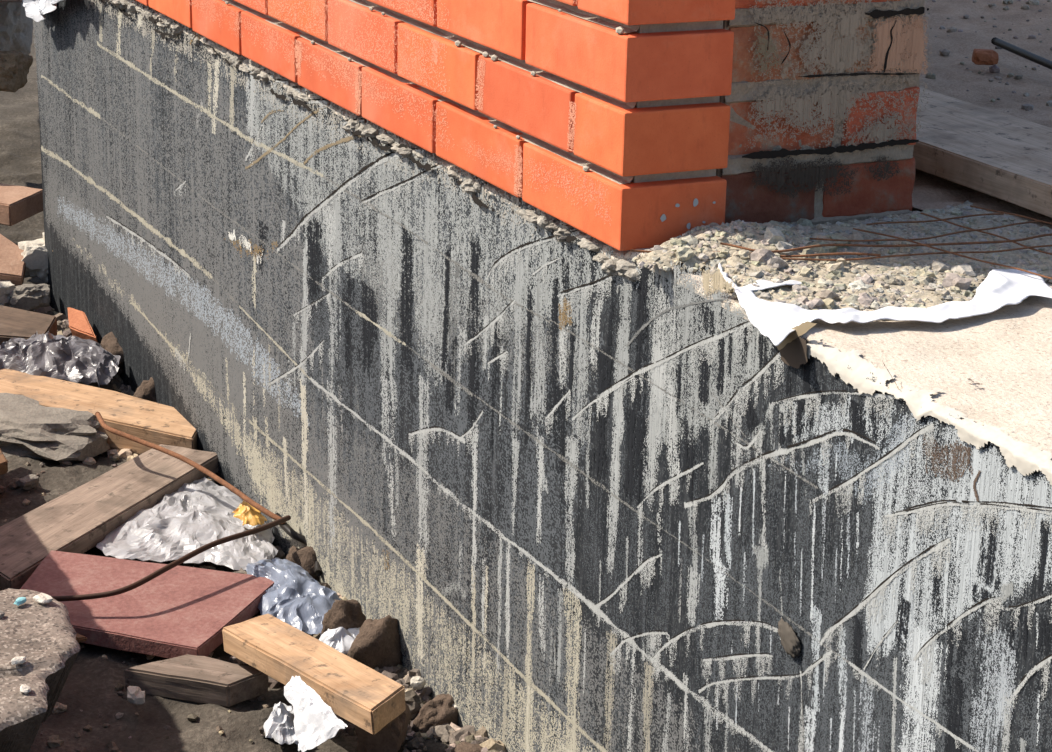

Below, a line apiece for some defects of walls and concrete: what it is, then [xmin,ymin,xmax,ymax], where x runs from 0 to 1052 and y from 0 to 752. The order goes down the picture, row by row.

crack [756,7,929,78]
crack [41,75,130,141]
crack [742,139,919,159]
crack [97,41,705,556]
crack [41,145,979,752]
spalling [776,321,1052,485]
crack [881,470,1052,543]
leakage [675,358,1052,752]
crack [913,594,1052,686]
crack [1009,654,1052,713]